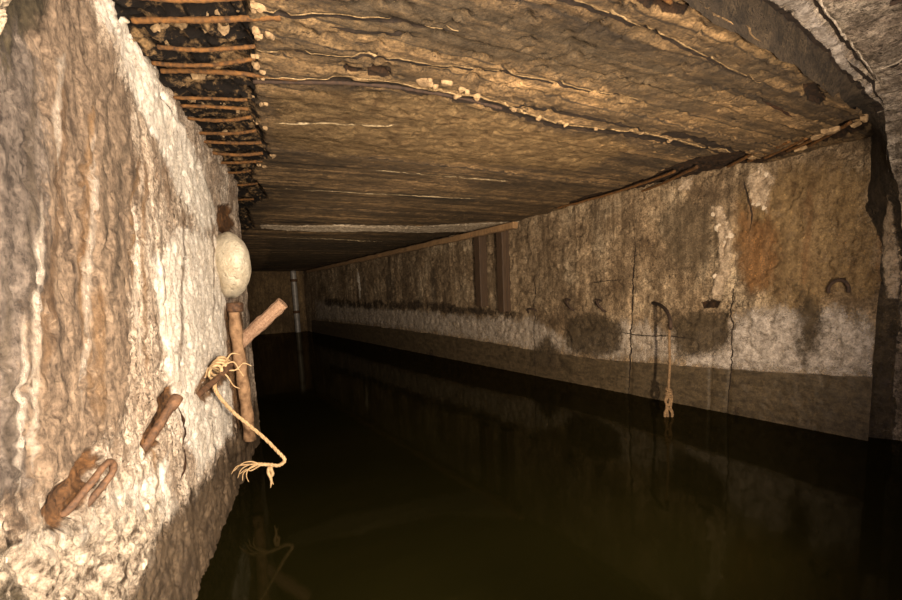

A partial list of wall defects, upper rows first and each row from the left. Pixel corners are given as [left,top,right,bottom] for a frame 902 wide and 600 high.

spalling [112,0,519,234]
crack [246,0,792,159]
leakage [0,0,59,500]
corrosion [0,0,148,546]
leakage [27,0,261,600]
corrosion [140,385,172,487]
leakage [312,271,902,441]
corrosion [738,163,882,306]
leakage [0,552,29,600]